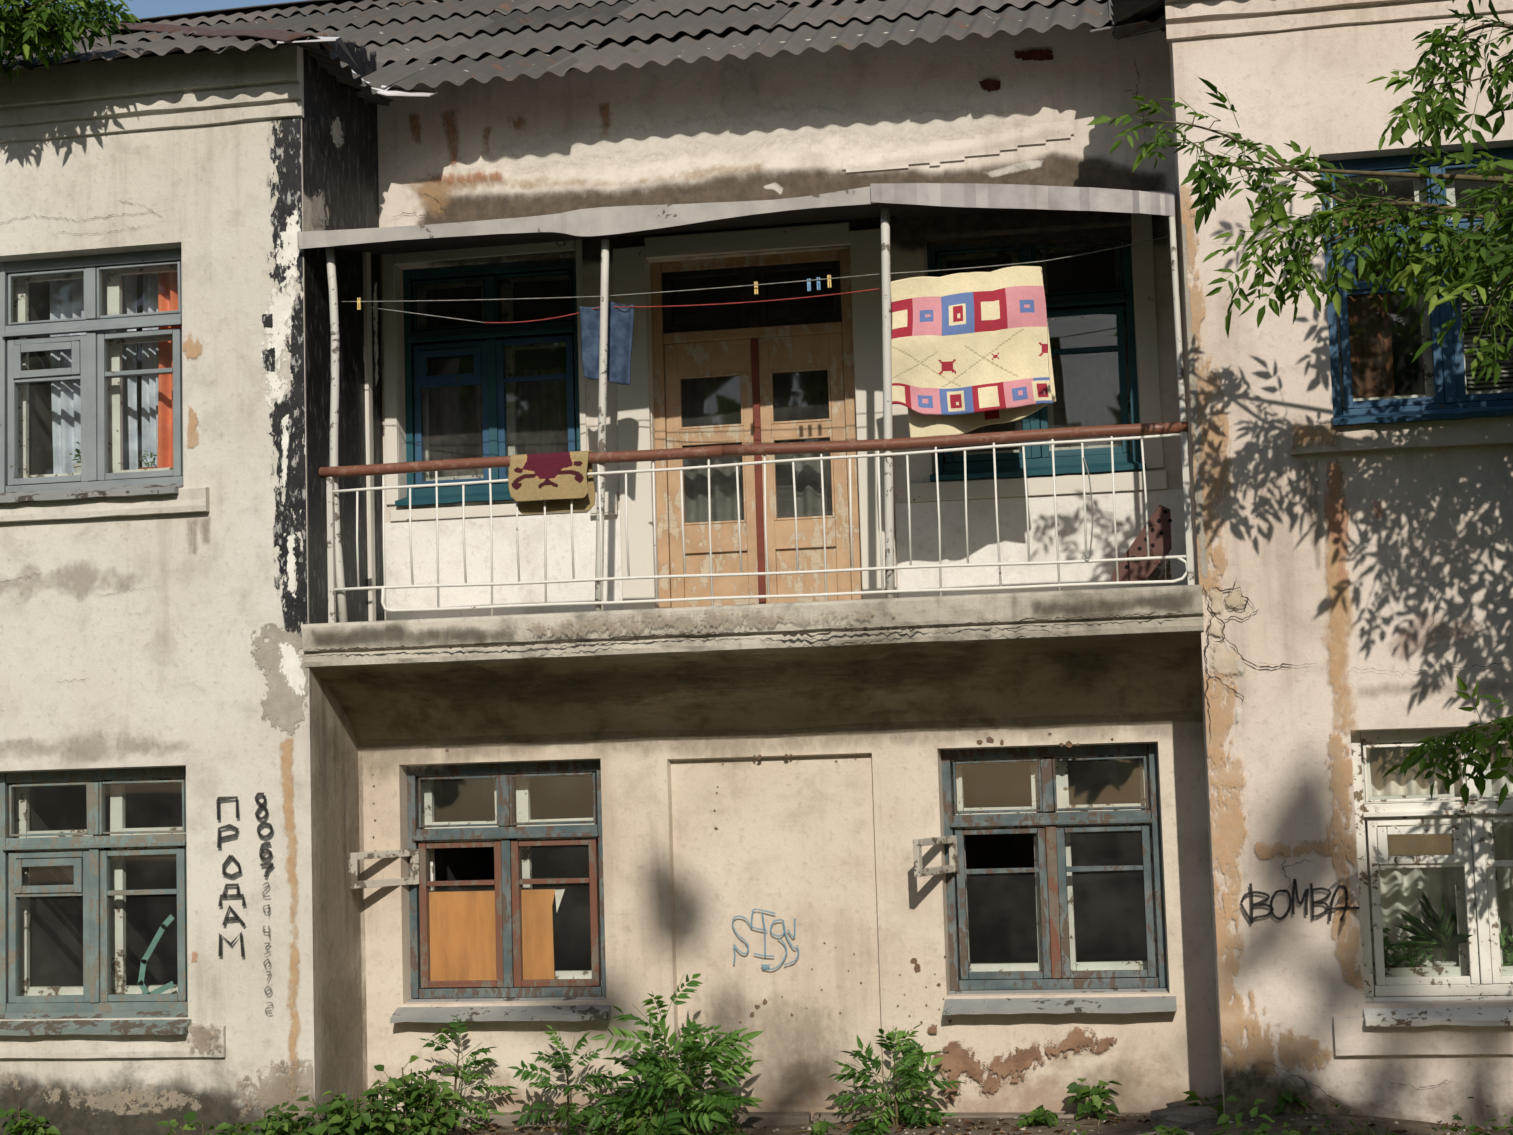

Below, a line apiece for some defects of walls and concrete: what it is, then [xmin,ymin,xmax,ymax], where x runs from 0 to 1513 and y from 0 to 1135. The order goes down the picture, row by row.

water stain [431,209,1132,267]
water stain [418,153,1164,225]
water stain [1152,214,1164,243]
peeling [251,35,384,735]
crack [308,554,1511,739]
rust [281,739,297,918]
peeling [1204,671,1363,1119]
water stain [0,1071,262,1135]
rust [288,942,299,1095]
peeling [897,956,1117,1103]